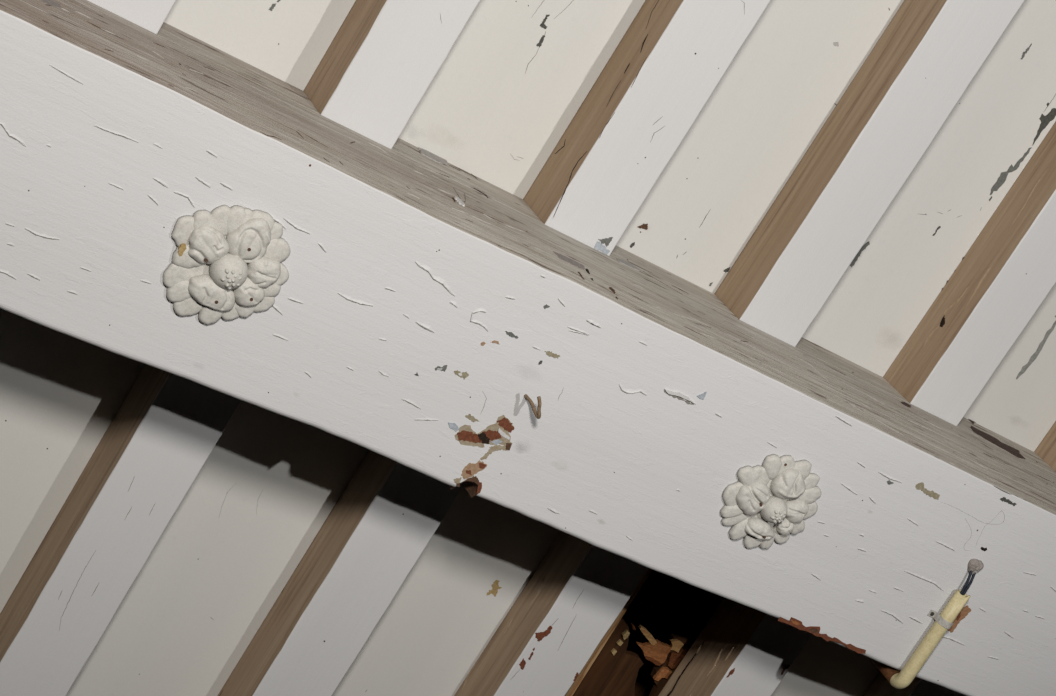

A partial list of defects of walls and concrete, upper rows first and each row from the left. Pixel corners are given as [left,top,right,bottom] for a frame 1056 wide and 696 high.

peeling [989,103,1056,201]
peeling [850,241,870,267]
peeling [448,414,514,498]
peeling [915,482,940,500]
peeling [486,580,502,597]
peeling [519,626,552,670]
spalling [778,617,866,654]